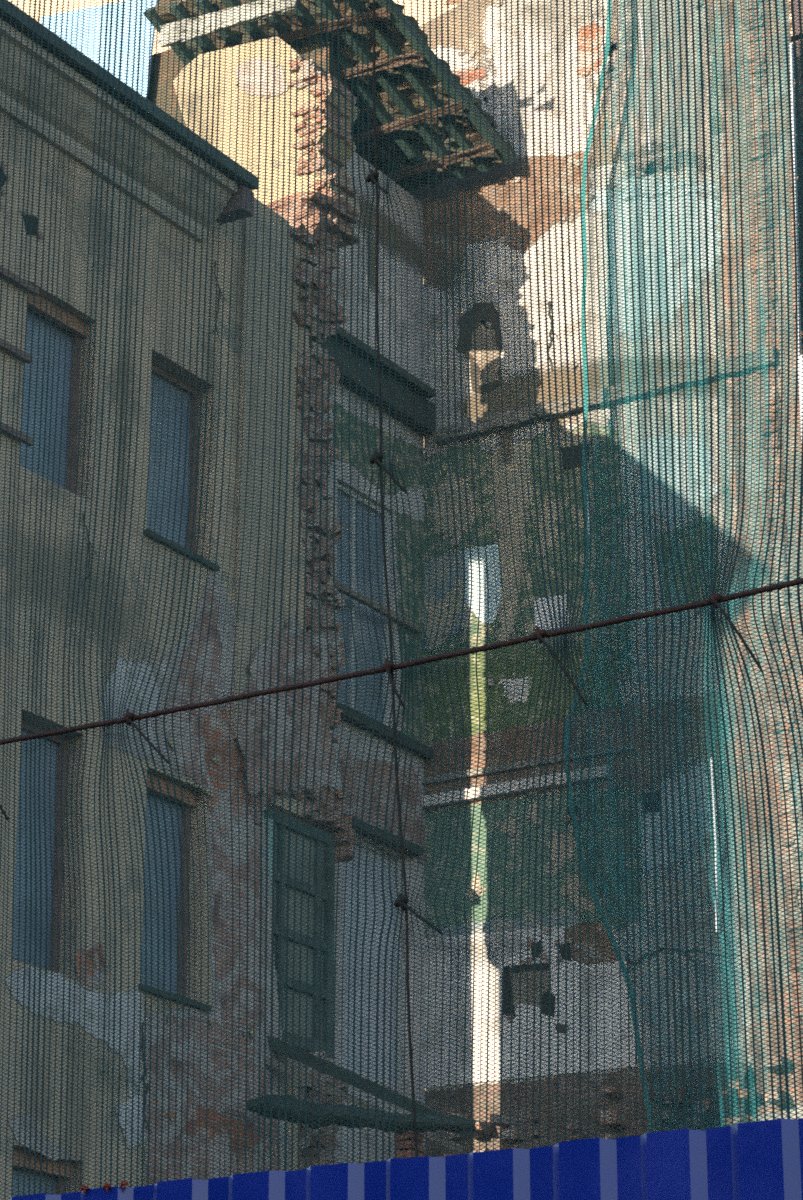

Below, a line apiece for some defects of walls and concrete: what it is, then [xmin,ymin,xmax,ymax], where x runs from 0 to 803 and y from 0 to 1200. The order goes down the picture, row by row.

peeling [432,0,725,373]
flaking render [101,570,254,775]